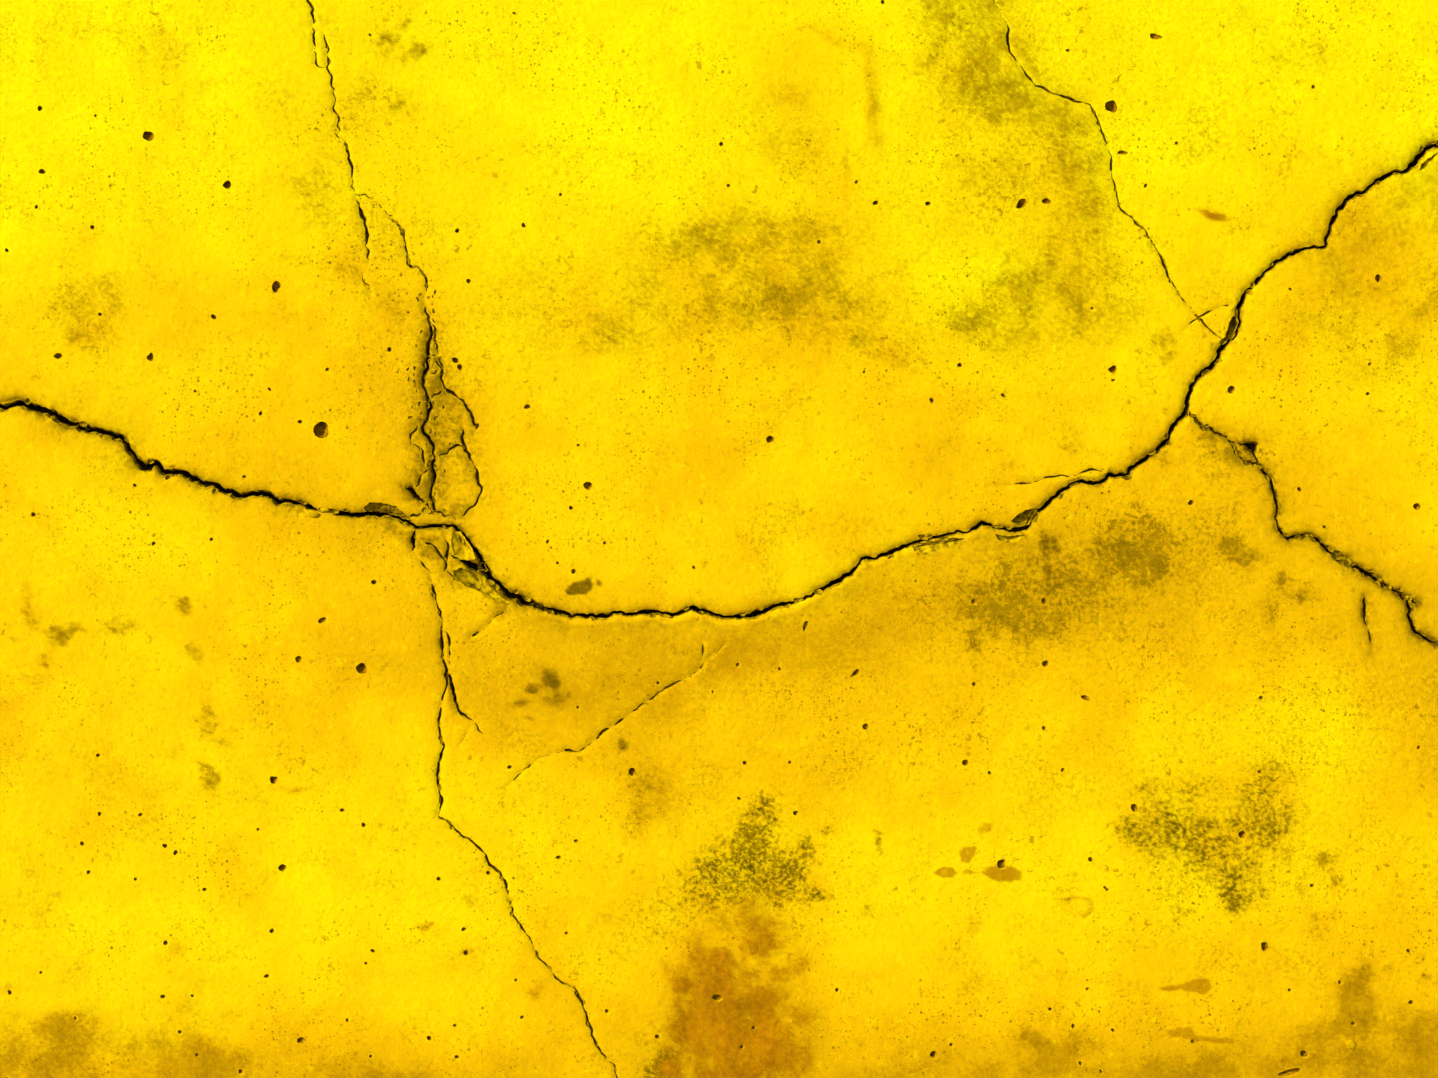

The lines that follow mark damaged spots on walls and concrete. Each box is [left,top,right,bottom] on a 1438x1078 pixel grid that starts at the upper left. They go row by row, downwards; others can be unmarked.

crack [0,0,1438,650]
crack [514,644,723,780]
crack [431,584,618,1078]
water stain [679,793,825,909]
water stain [1115,761,1290,912]
water stain [0,1013,95,1078]
water stain [142,1035,247,1078]
water stain [643,1054,674,1078]
water stain [1018,1031,1082,1078]
water stain [1259,965,1438,1078]